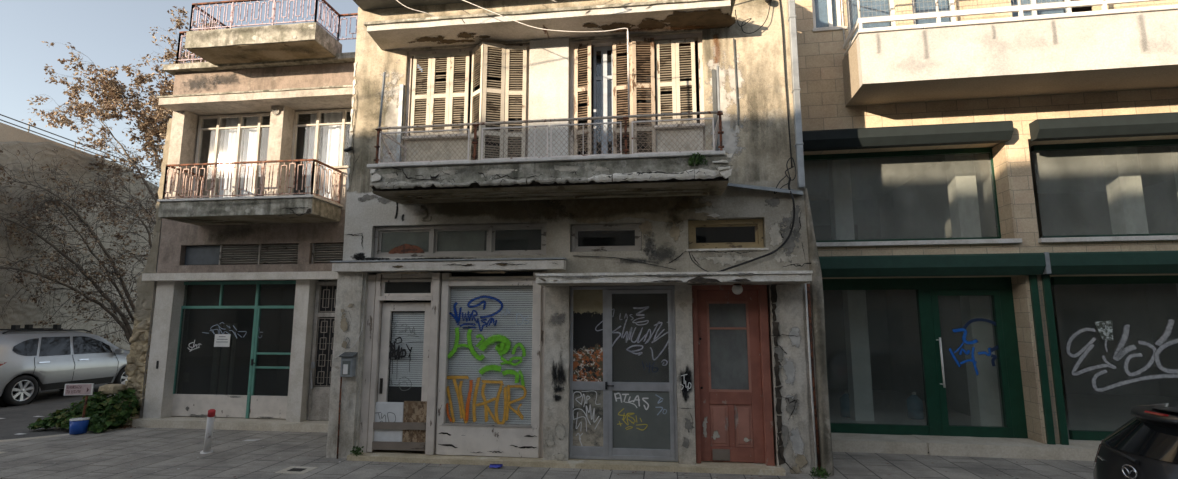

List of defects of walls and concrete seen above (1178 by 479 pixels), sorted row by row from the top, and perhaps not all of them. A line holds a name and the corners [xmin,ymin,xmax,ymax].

peeling [583,9,736,32]
peeling [408,32,491,44]
spalling [346,46,747,204]
peeling [645,253,754,285]
peeling [679,365,692,401]
spalling [770,284,808,474]
peeling [682,417,720,448]